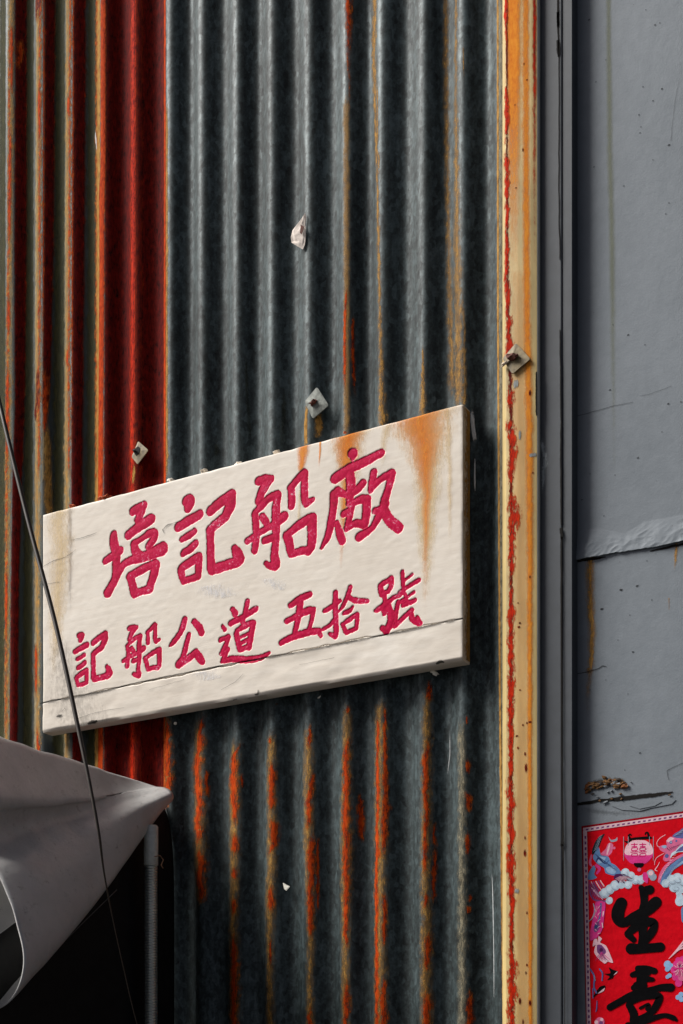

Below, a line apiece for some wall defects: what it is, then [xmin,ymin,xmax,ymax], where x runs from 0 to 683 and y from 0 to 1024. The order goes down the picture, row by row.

corrosion [4,0,168,750]
corrosion [497,0,537,1024]
corrosion [64,732,81,762]
corrosion [94,717,175,790]
corrosion [193,719,209,903]
corrosion [229,746,243,1024]
corrosion [266,738,280,1024]
corrosion [304,727,320,1024]
corrosion [341,706,390,1024]
corrosion [421,681,437,1024]
corrosion [458,717,473,1024]
peeling [584,770,676,811]